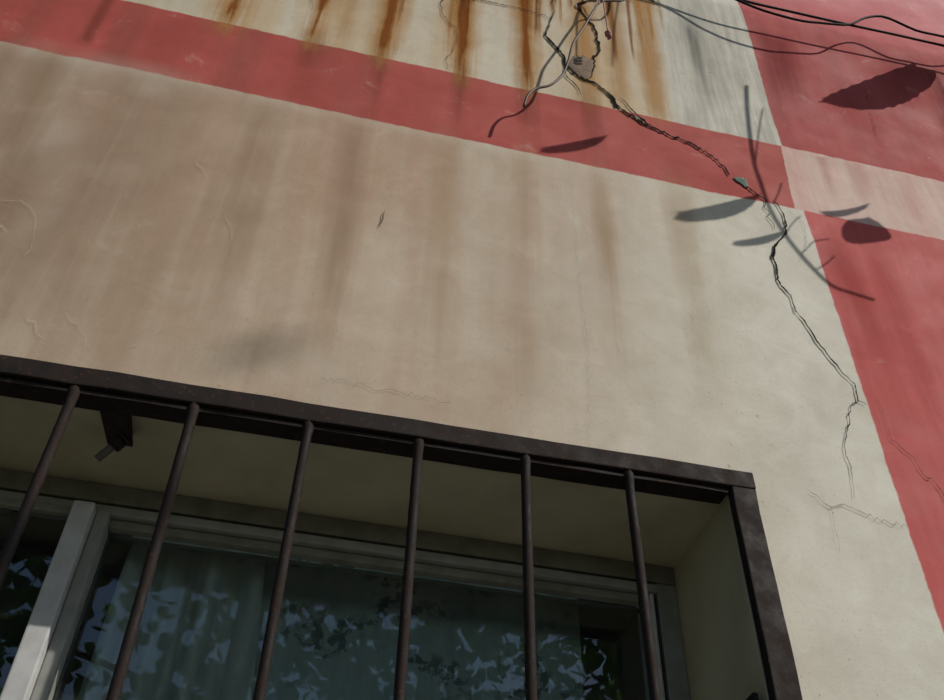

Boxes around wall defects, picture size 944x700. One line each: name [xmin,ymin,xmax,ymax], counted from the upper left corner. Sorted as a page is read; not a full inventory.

rust [224,0,241,18]
rust [311,0,329,37]
rust [379,0,400,50]
rust [451,0,474,81]
rust [515,0,538,83]
rust [606,2,615,50]
rust [626,0,662,109]
crack [480,0,944,550]